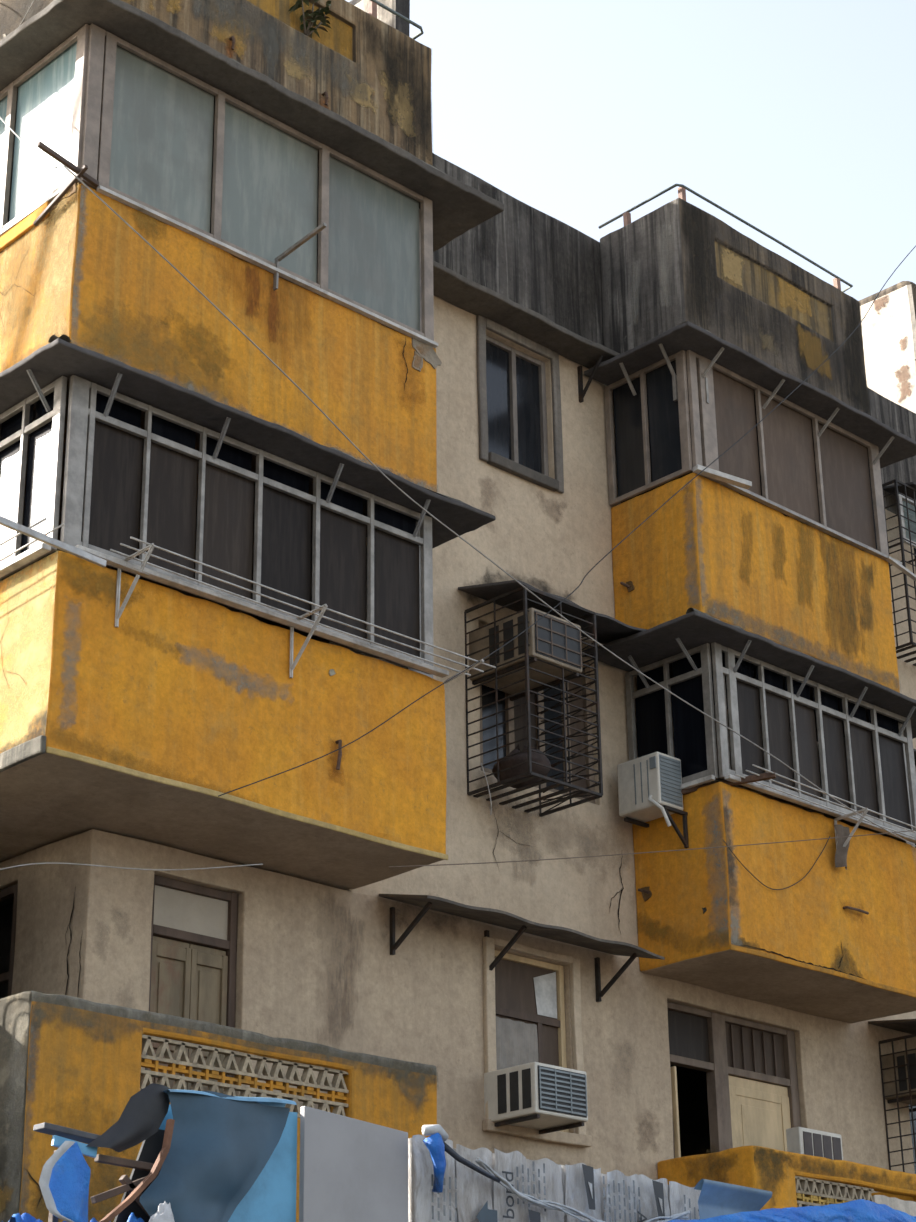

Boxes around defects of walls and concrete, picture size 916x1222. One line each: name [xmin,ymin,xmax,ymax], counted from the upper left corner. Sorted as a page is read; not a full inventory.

water stain [369,24,433,151]
peeling [721,249,742,286]
peeling [779,277,831,379]
crack [65,887,82,995]